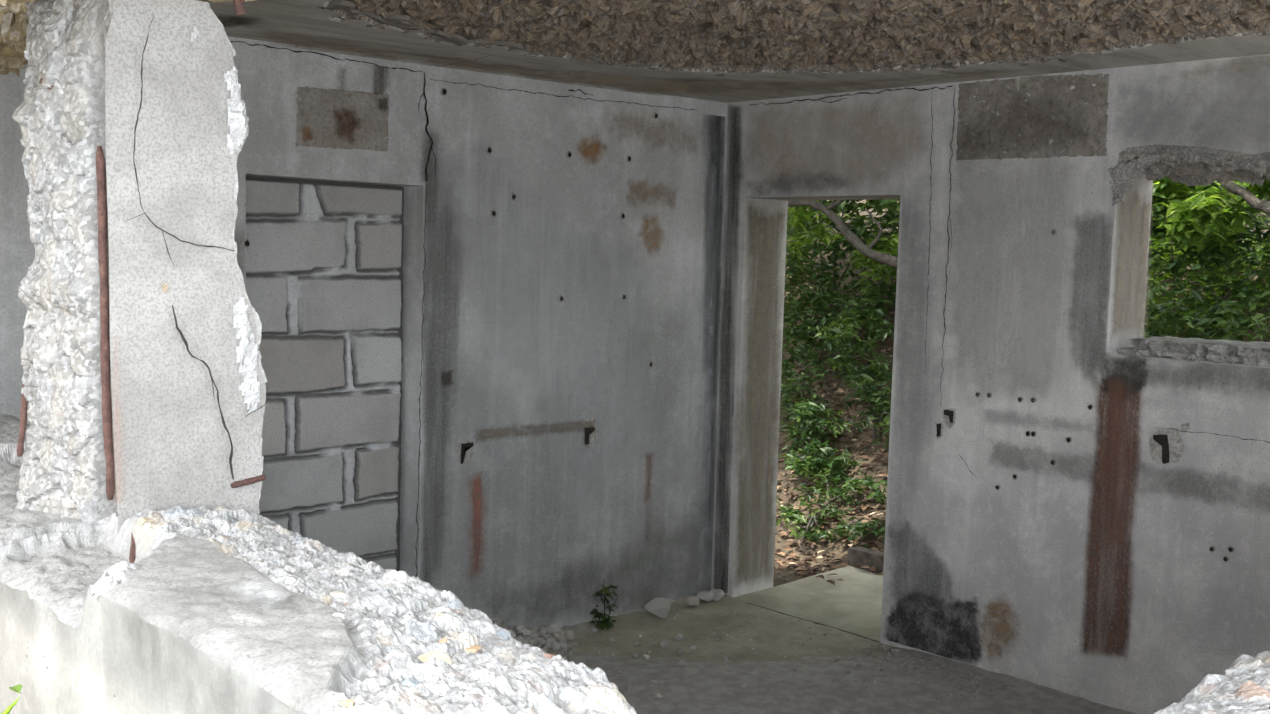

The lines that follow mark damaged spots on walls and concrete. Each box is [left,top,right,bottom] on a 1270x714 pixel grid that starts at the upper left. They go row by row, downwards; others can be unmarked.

spalling [316,0,1270,77]
crack [124,17,234,265]
spalling [224,66,248,154]
water stain [374,67,387,110]
rust [580,141,600,162]
spalling [1109,153,1175,206]
spalling [16,384,27,457]
spalling [96,146,115,500]
crack [172,305,268,480]
spalling [233,294,260,413]
rust [473,476,481,571]
rust [1083,372,1143,655]